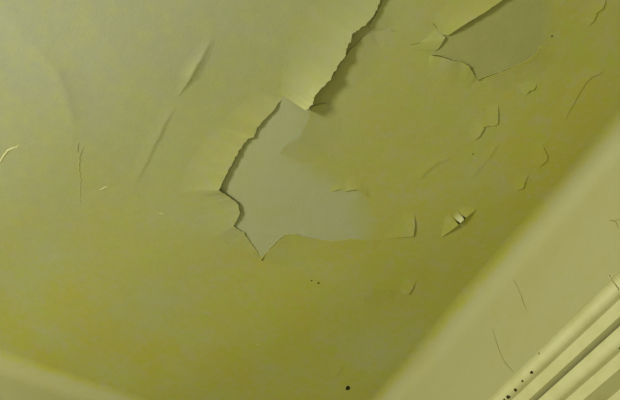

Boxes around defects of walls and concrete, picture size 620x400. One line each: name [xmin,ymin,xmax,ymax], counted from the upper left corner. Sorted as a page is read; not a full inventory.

peeling [179,0,415,272]
peeling [410,0,556,94]